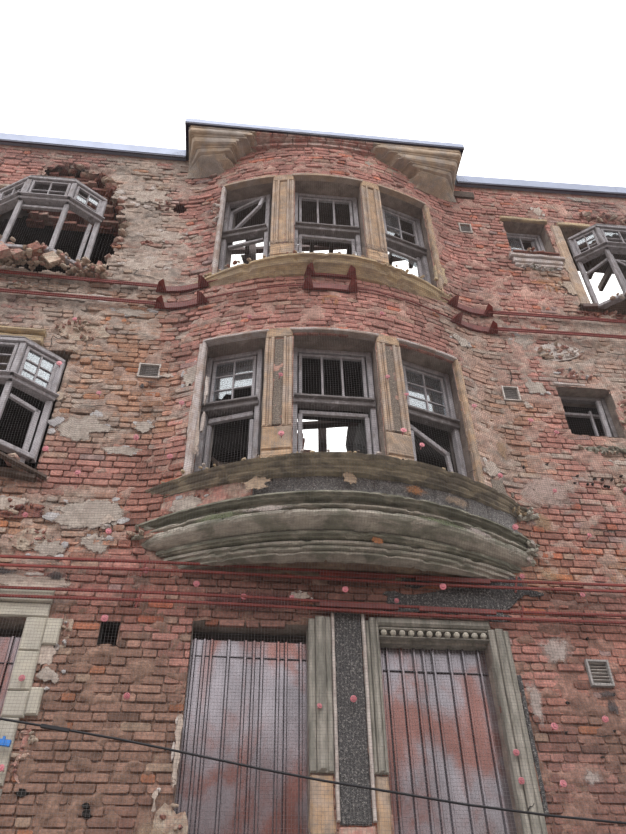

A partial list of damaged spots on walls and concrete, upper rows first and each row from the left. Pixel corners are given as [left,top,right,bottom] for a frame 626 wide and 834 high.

spalling [22,160,188,271]
flaking render [47,410,114,442]
flaking render [133,420,155,433]
flaking render [241,476,271,490]
spalling [8,528,69,561]
flaking render [0,495,154,553]
flaking render [171,714,183,787]
spalling [151,788,188,834]